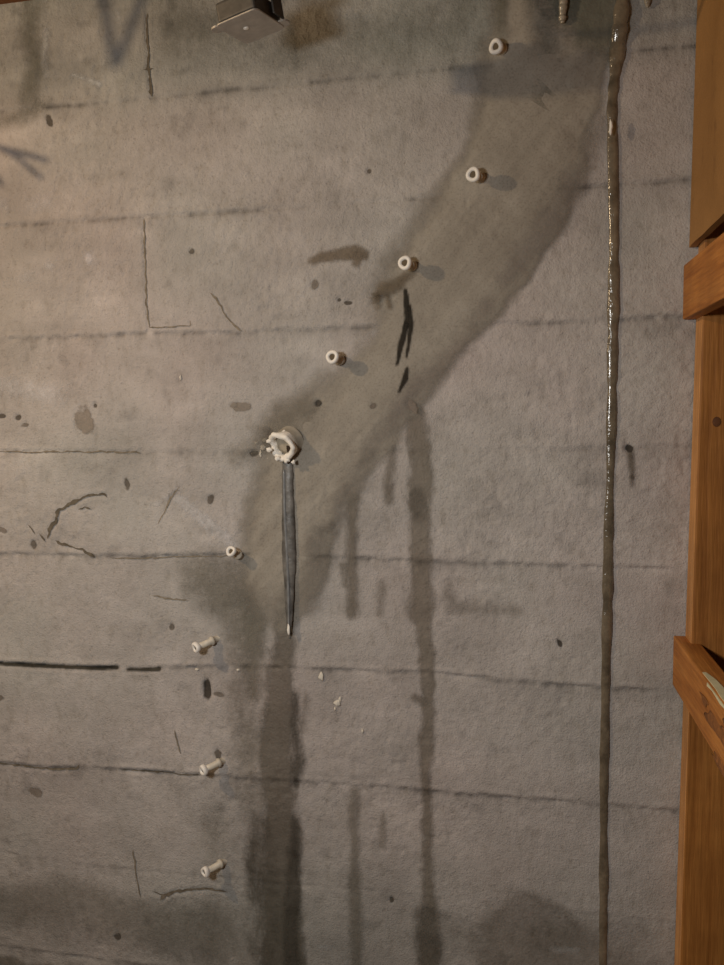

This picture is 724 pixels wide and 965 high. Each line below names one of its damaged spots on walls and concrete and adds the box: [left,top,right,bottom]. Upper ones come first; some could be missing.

leakage [310,246,368,266]
leakage [372,271,414,307]
crack [28,493,228,559]
leakage [345,497,358,618]
leakage [407,407,439,965]
crack [132,852,226,900]
leakage [345,790,360,965]